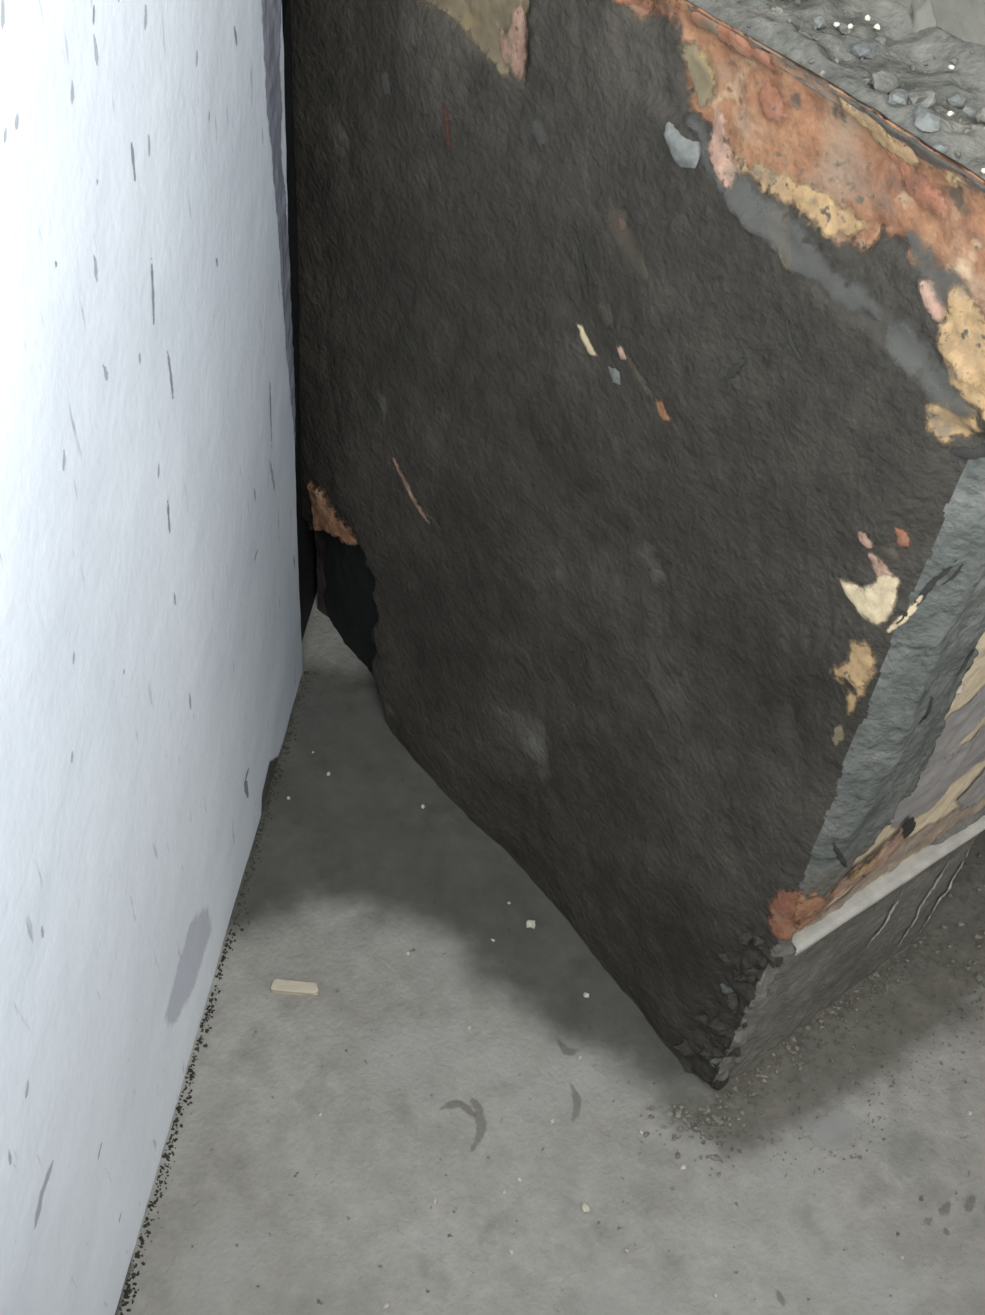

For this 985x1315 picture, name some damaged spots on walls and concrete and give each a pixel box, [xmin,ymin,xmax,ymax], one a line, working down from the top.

flaking render [421,0,530,79]
spalling [608,0,985,443]
spalling [840,528,910,625]
spalling [832,641,875,746]
spalling [955,648,975,695]